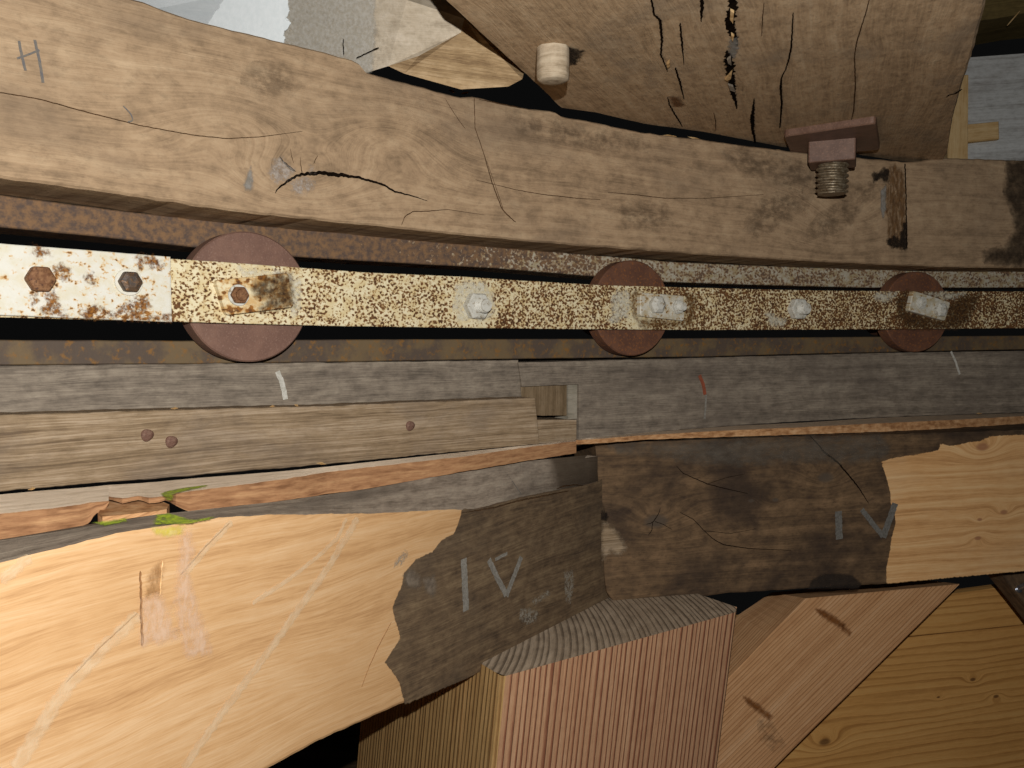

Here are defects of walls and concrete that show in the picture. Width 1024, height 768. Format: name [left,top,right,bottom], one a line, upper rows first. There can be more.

crack [650,0,794,143]
crack [851,0,870,120]
crack [0,92,763,223]
water stain [872,165,908,250]
water stain [987,161,1024,264]
corrosion [31,291,68,318]
corrosion [82,296,170,321]
corrosion [253,275,292,309]
corrosion [632,292,696,327]
corrosion [897,291,977,329]
crack [810,436,868,502]
crack [648,510,777,550]